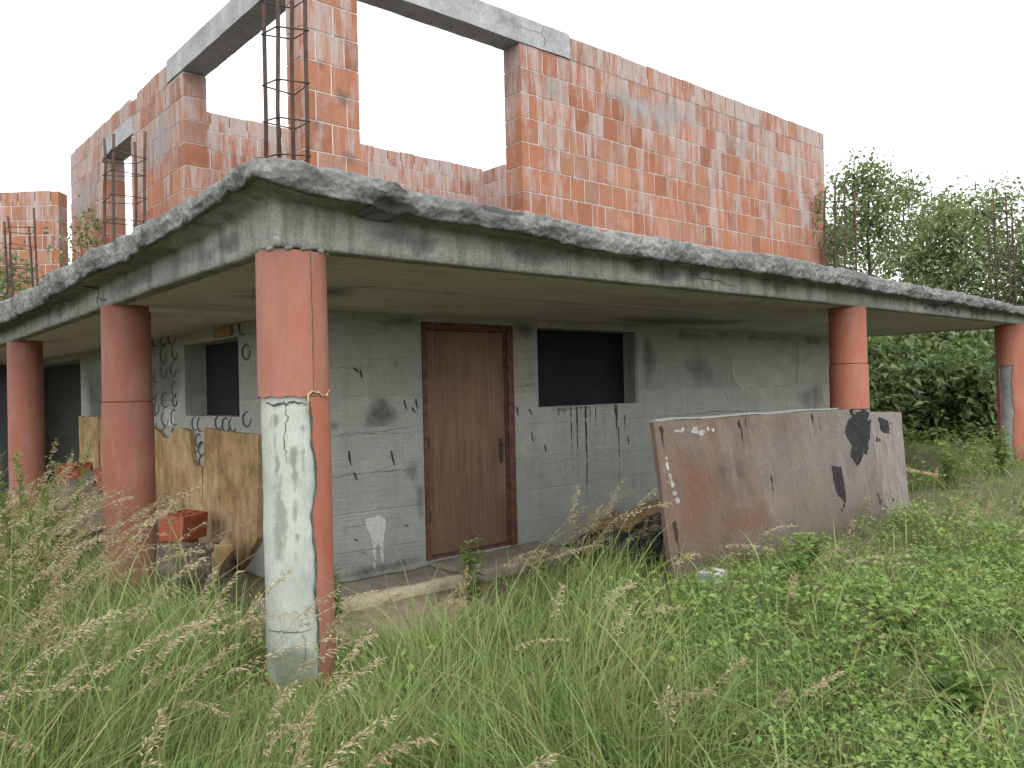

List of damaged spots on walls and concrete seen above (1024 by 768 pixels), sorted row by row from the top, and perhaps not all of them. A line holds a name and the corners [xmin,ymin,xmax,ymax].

crack [310,251,375,378]
crack [266,401,306,462]
leakage [557,406,596,477]
peeling [845,408,905,466]
peeling [832,466,846,511]
peeling [309,398,321,686]
crack [268,628,312,668]